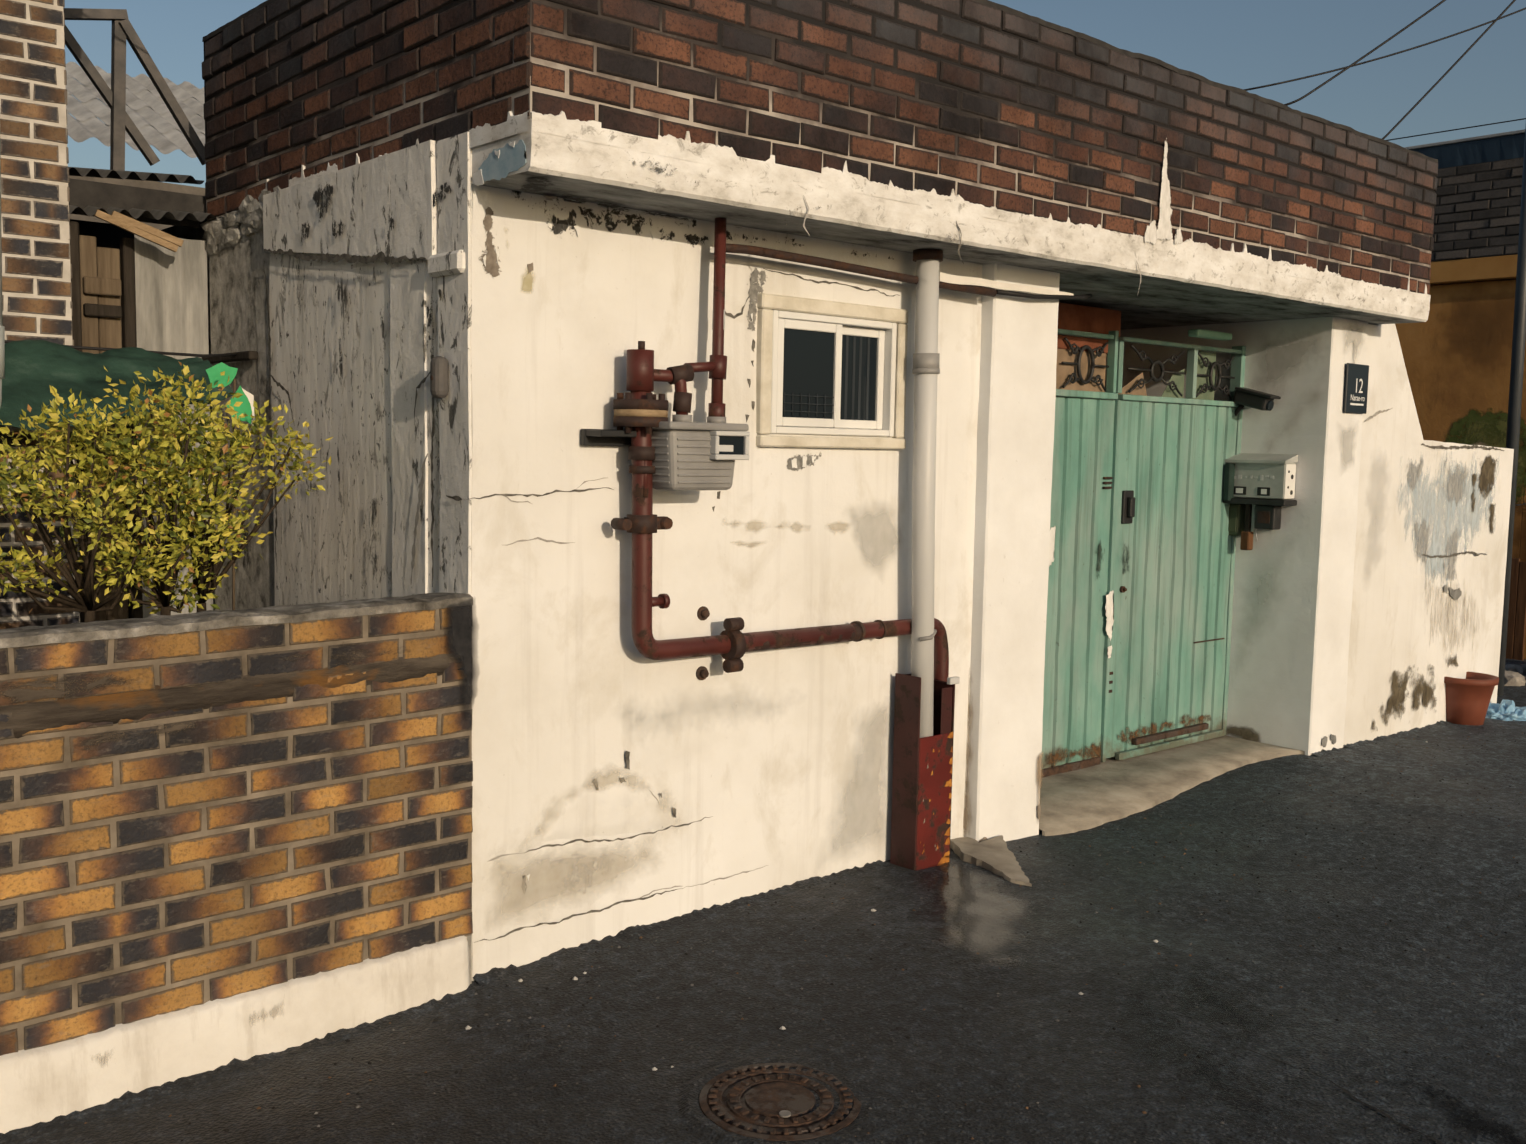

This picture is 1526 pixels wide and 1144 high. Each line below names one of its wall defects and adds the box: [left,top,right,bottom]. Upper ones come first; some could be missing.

peeling [301,184,344,242]
peeling [433,182,451,218]
peeling [479,207,502,277]
peeling [472,140,708,247]
crack [264,249,613,587]
peeling [1399,456,1497,600]
corrosion [1118,715,1211,743]
corrosion [1037,743,1101,819]
crack [487,789,713,862]
crack [474,865,768,943]